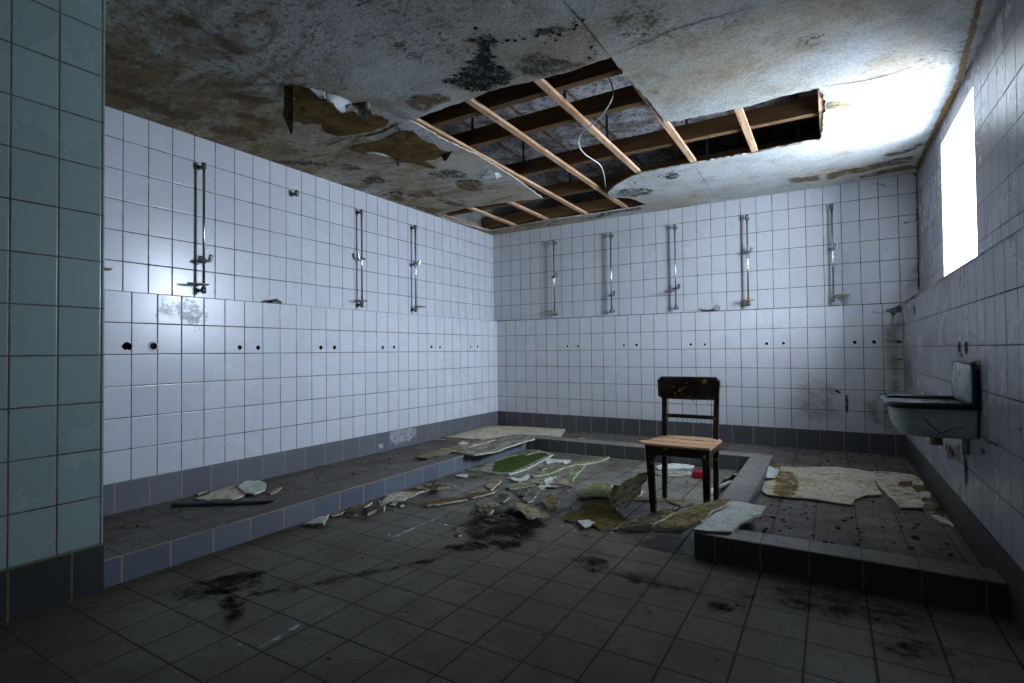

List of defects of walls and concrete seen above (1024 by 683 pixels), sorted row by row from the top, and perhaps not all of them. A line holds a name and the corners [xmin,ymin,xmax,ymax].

leakage [398,18,598,112]
leakage [210,94,274,142]
peeling [283,84,452,169]